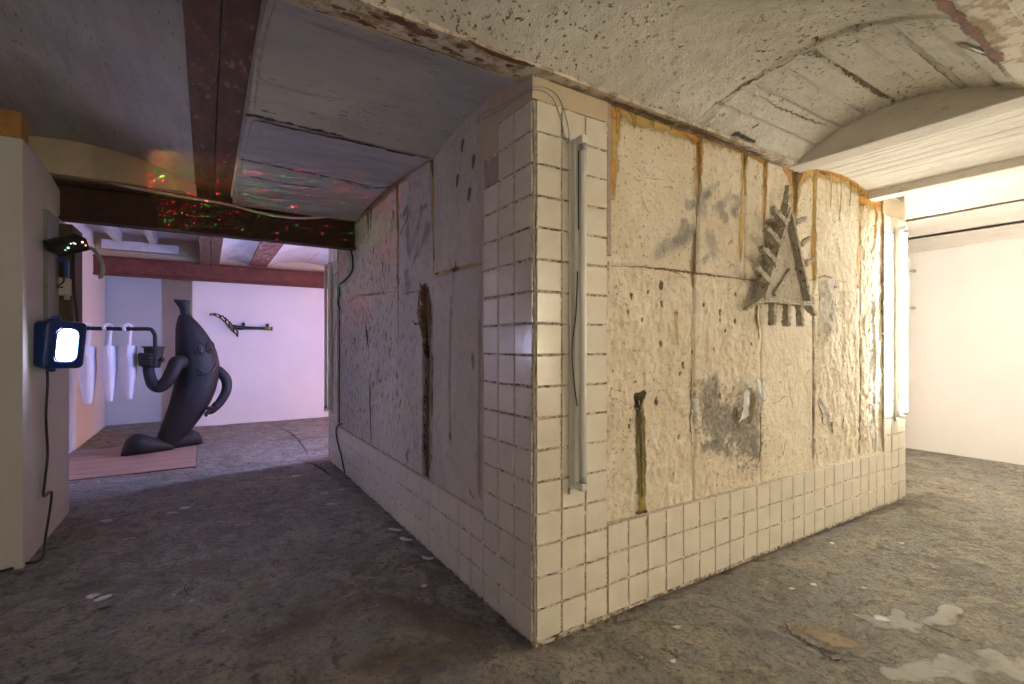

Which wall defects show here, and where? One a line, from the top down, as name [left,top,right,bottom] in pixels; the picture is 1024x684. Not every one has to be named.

flaking render [956,43,988,56]
corrosion [611,105,768,262]
corrosion [801,169,883,288]
crack [357,209,434,479]
flaking render [694,378,763,469]
water stain [739,378,767,423]